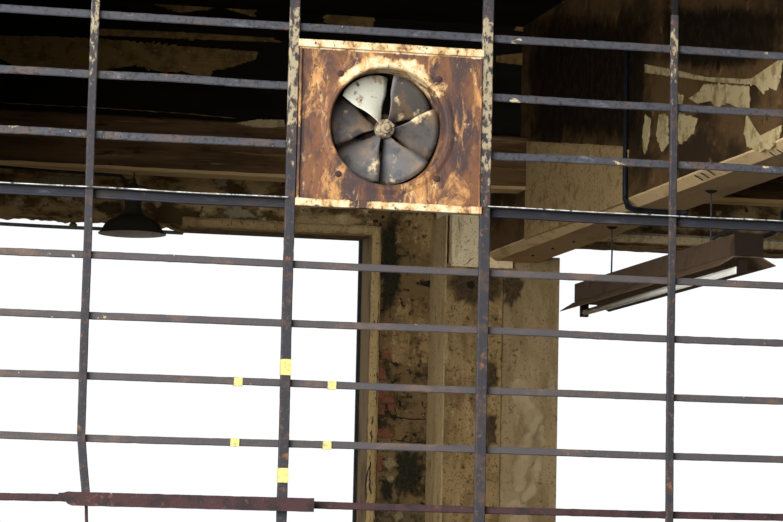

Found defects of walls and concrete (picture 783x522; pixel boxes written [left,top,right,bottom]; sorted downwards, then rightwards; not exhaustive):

peeling [0,29,281,77]
peeling [642,60,783,154]
water stain [94,201,124,216]
water stain [380,226,401,314]
mould [380,451,421,499]